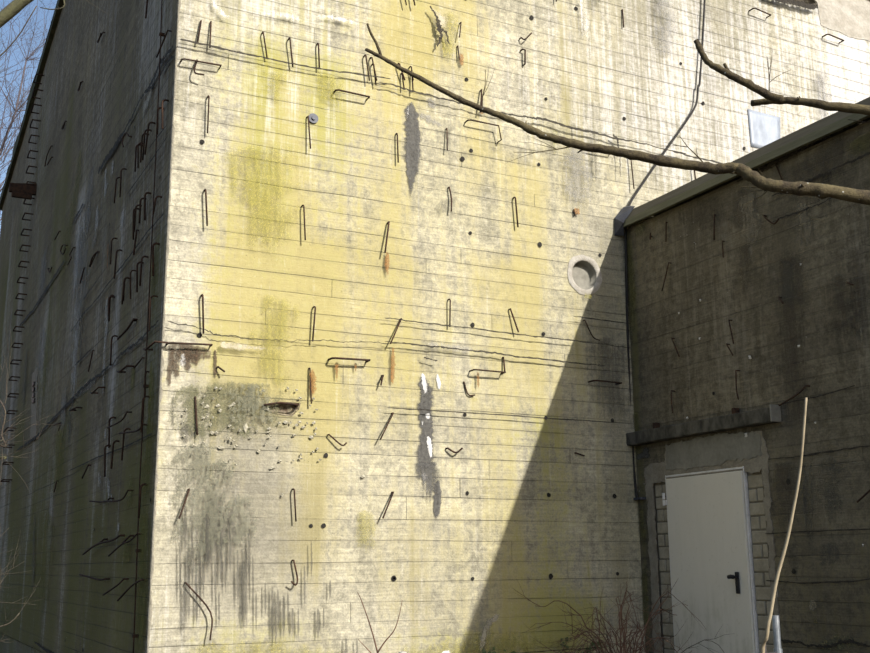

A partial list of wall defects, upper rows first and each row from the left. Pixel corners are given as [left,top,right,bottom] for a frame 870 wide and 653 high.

crack [430,6,450,47]
crack [777,0,818,10]
water stain [404,102,422,193]
peeling [182,386,322,469]
water stain [416,373,441,517]
water stain [179,495,312,639]